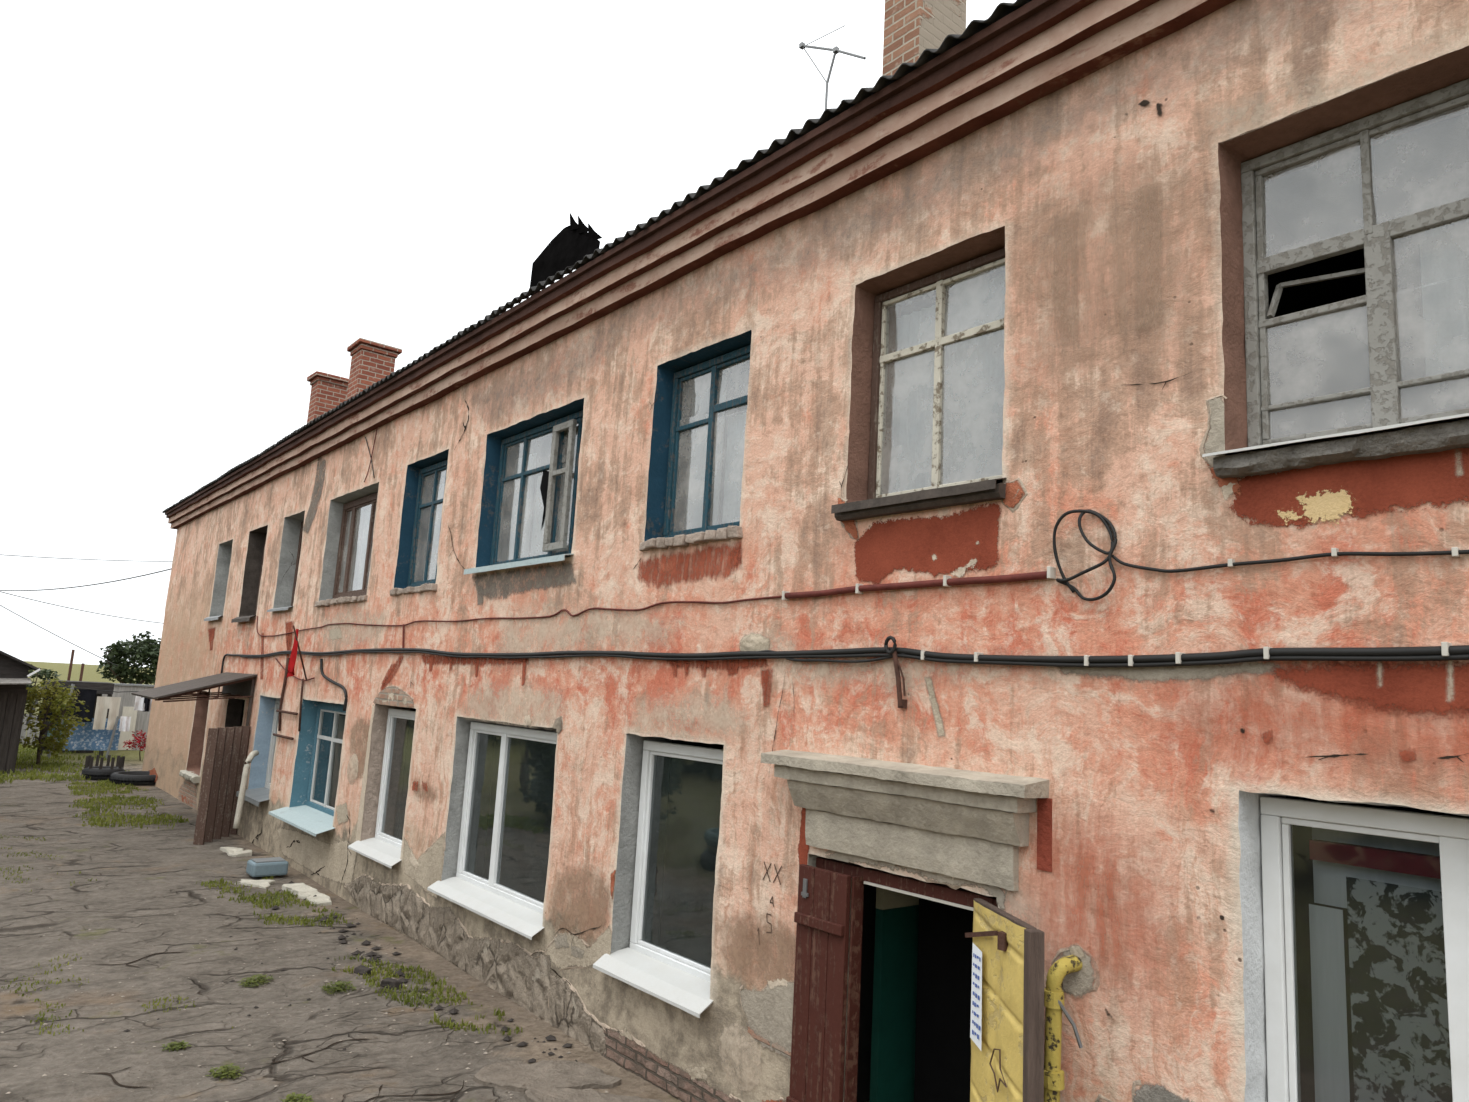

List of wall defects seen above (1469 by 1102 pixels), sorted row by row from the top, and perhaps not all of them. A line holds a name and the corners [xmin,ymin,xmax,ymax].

peeling [1199,394,1469,529]
peeling [838,478,1028,584]
spalling [277,686,744,1102]
peeling [740,978,794,1060]
peeling [1131,1080,1195,1102]